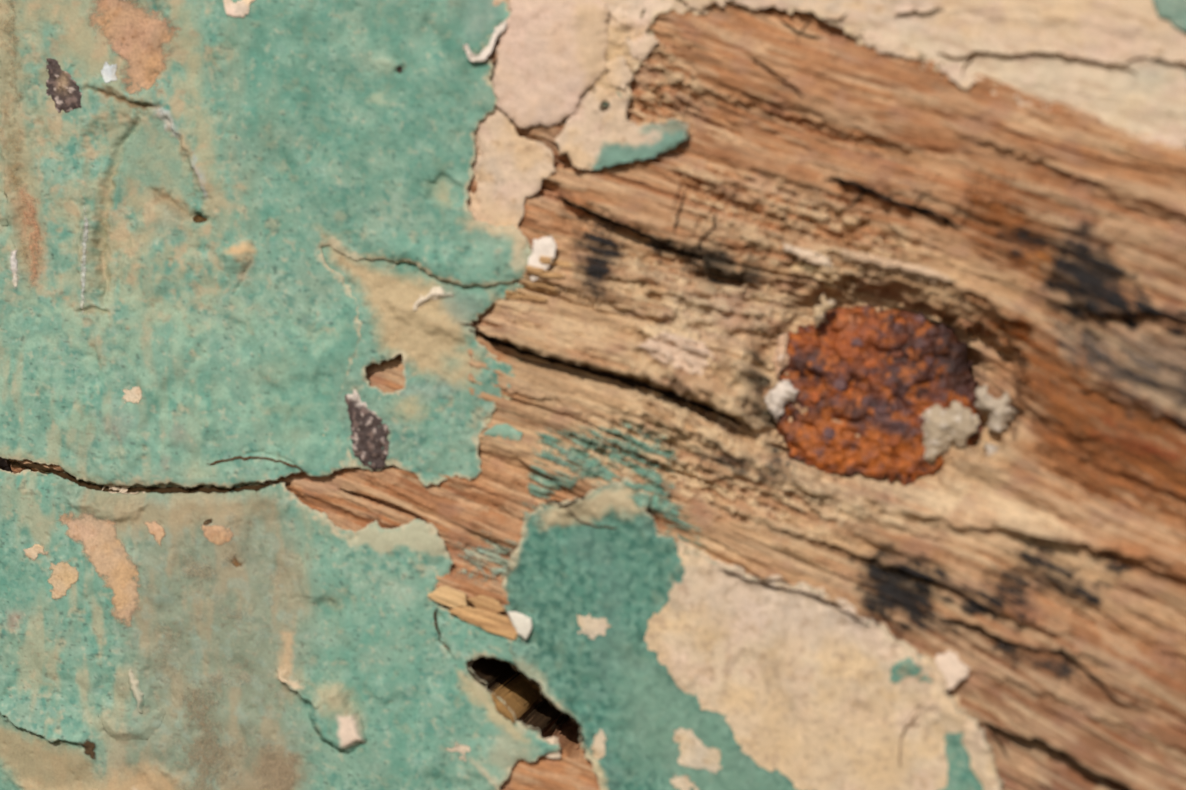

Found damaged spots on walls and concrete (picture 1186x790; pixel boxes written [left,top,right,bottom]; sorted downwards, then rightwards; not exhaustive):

peeling [463,21,507,62]
peeling [605,32,660,90]
peeling [857,30,984,90]
peeling [525,236,557,282]
peeling [483,423,523,441]
crack [0,456,308,493]
crack [337,488,428,521]
peeling [508,611,532,639]
spalling [576,614,611,639]
peeling [644,534,1002,790]
spalling [446,742,471,762]
spalling [591,729,607,760]